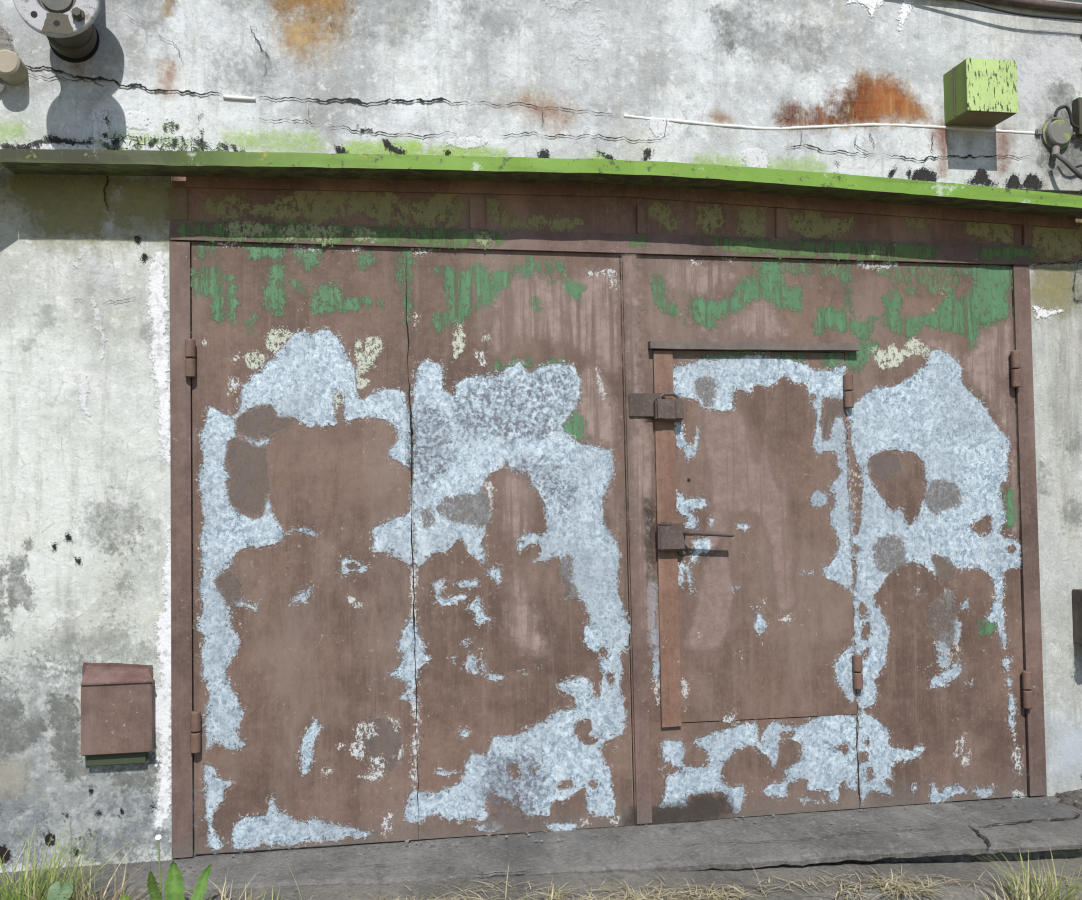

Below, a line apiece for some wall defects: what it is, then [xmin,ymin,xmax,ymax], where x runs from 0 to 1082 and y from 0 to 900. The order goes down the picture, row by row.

corrosion [276,0,346,51]
crack [26,65,222,100]
crack [250,26,667,141]
corrosion [779,75,926,129]
crack [1031,259,1082,302]
water stain [0,539,36,636]
water stain [108,494,172,831]
peeling [193,326,631,855]
peeling [645,564,660,710]
peeling [656,347,1026,815]
water stain [0,690,91,782]
water stain [0,790,53,866]